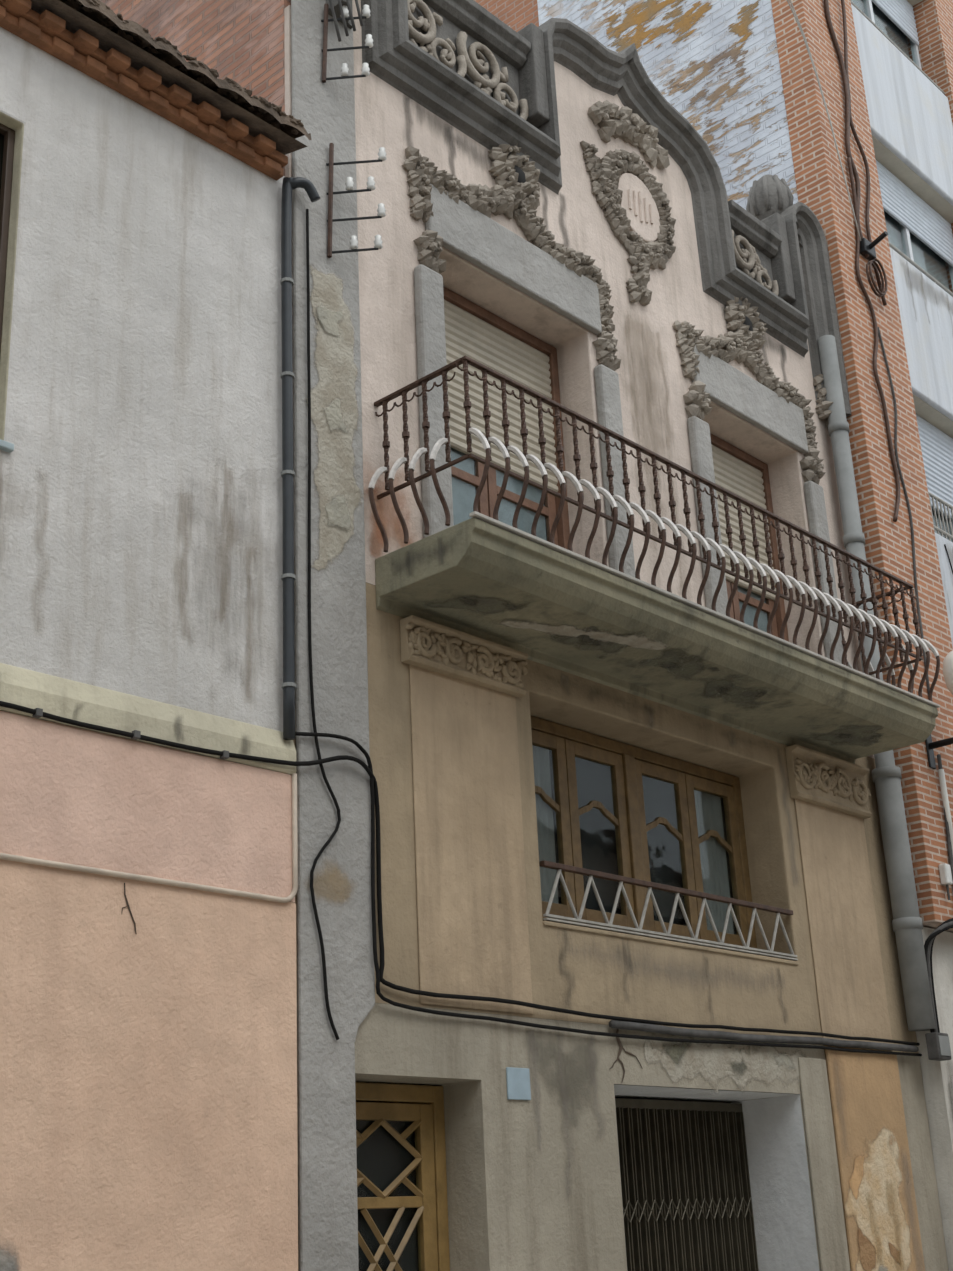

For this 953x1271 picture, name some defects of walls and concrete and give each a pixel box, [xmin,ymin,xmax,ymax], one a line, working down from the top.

peeling [603,0,712,53]
peeling [669,0,760,151]
crack [122,883,136,933]
crack [610,1029,643,1082]
peeling [845,1128,911,1271]